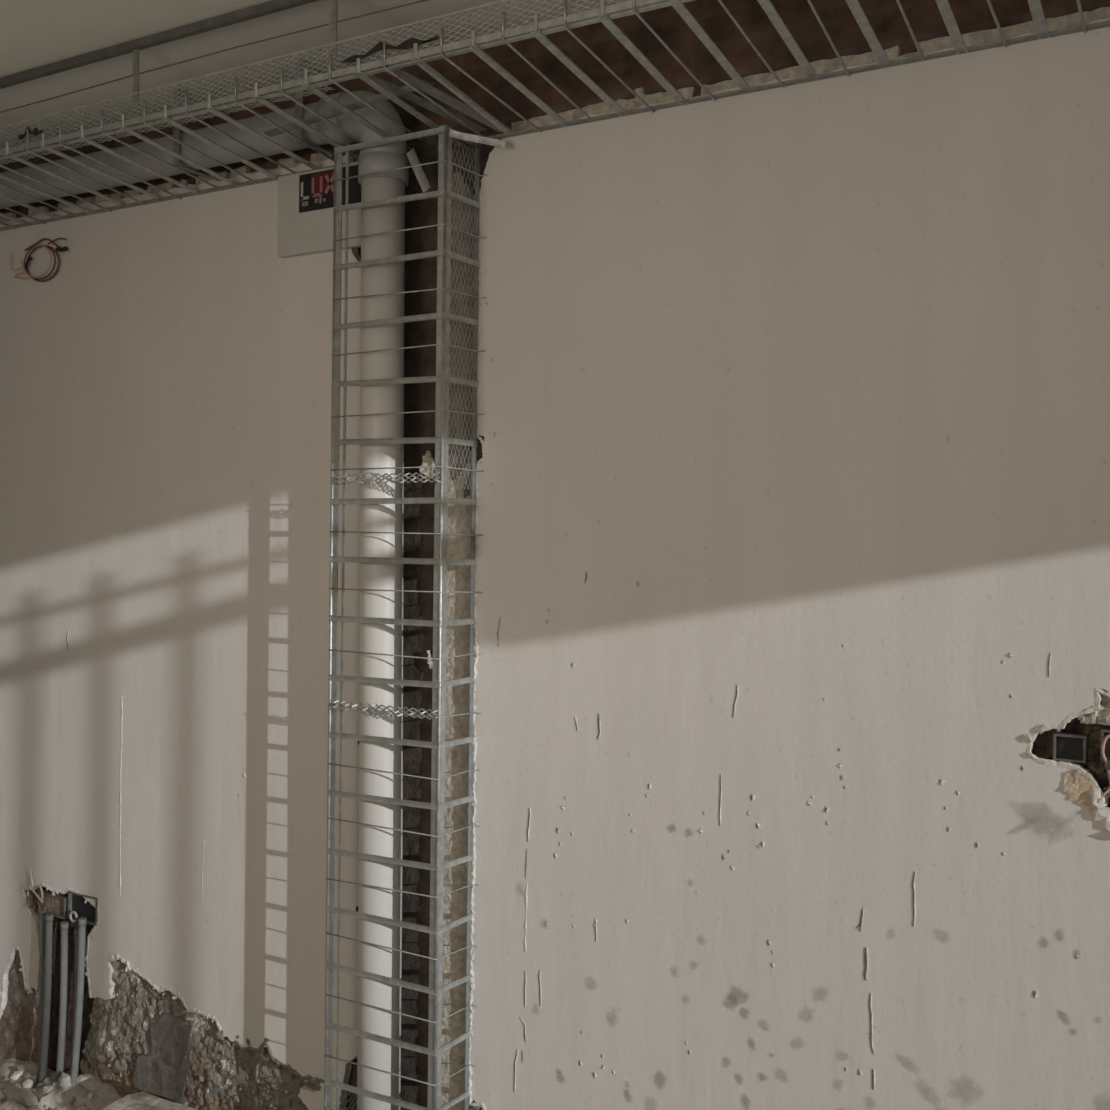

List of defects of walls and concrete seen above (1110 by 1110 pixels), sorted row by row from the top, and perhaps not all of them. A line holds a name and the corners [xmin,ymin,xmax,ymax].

spalling [1021,688,1110,833]
spalling [0,883,324,1110]